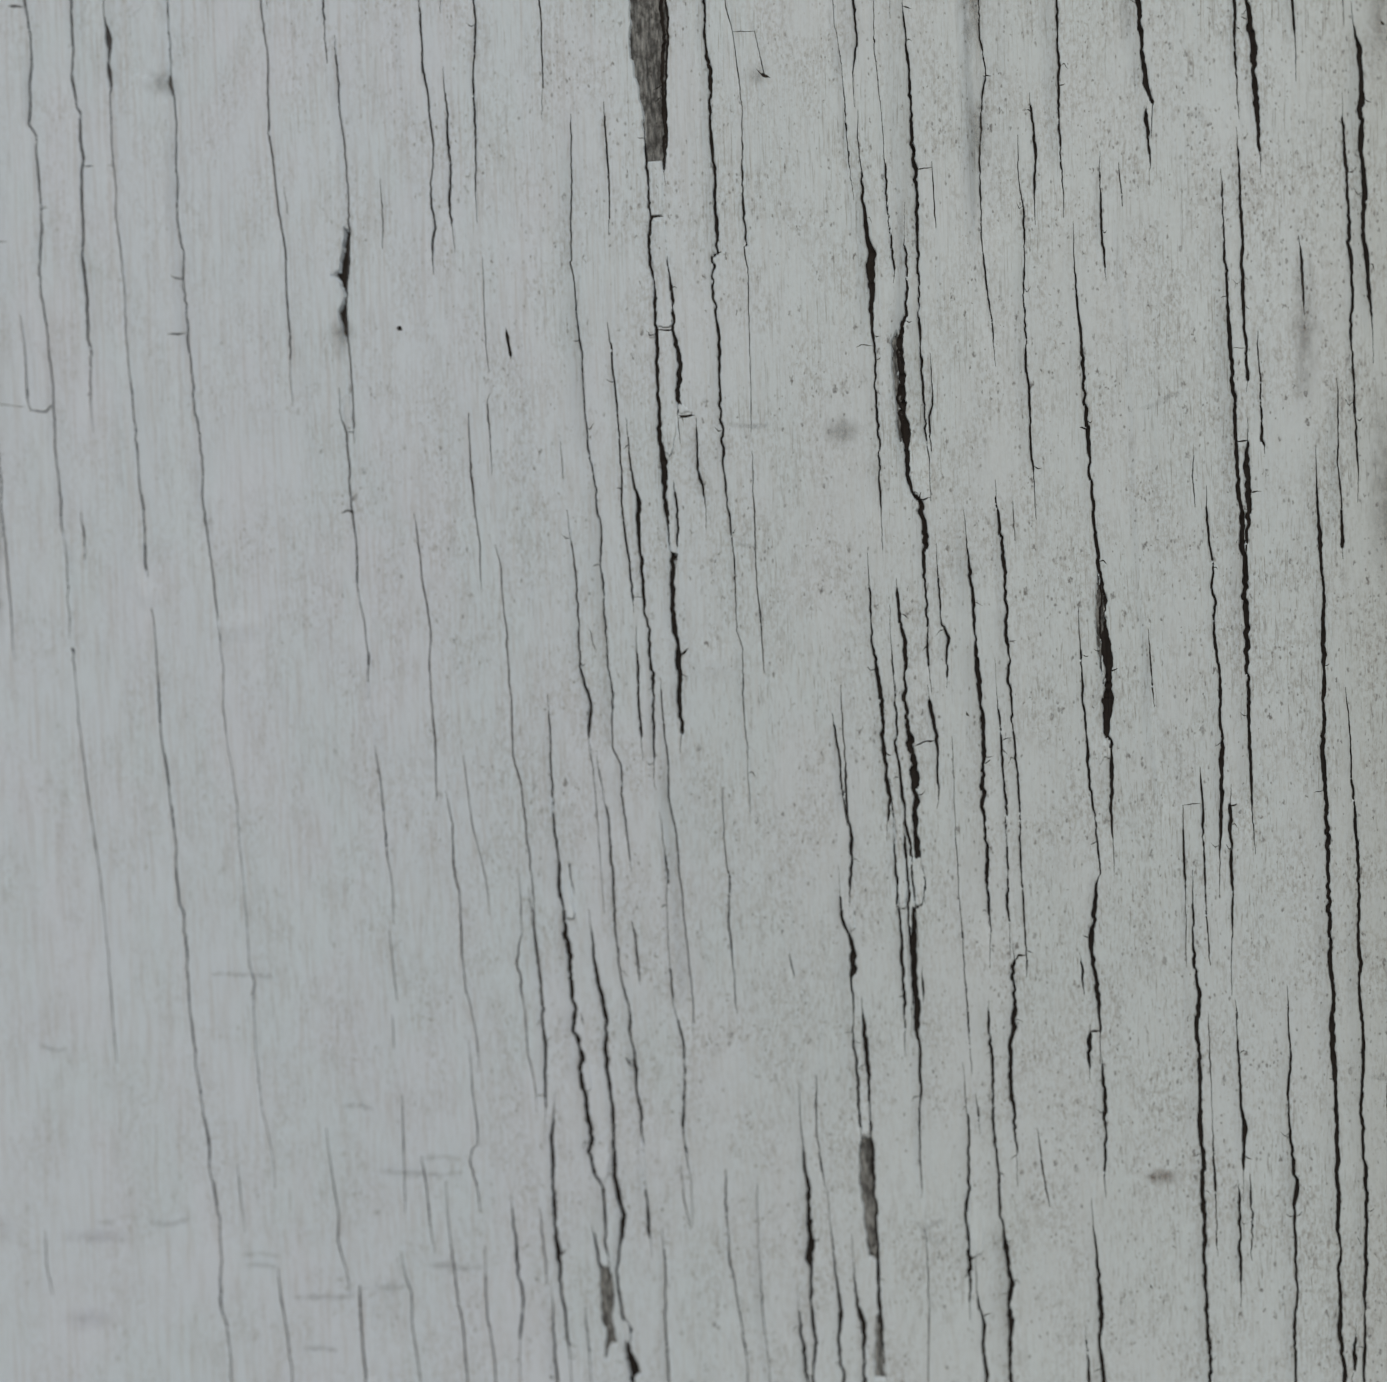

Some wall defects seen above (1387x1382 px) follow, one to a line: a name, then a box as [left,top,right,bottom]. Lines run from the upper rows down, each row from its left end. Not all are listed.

crack [0,0,149,1063]
crack [151,609,245,1382]
crack [167,0,275,1189]
crack [260,0,295,404]
crack [326,1128,367,1382]
crack [322,0,384,698]
crack [374,745,397,1045]
peeling [629,0,668,165]
peeling [859,1138,880,1263]
crack [1182,0,1303,1382]
crack [1297,235,1305,315]
crack [1315,0,1387,1382]